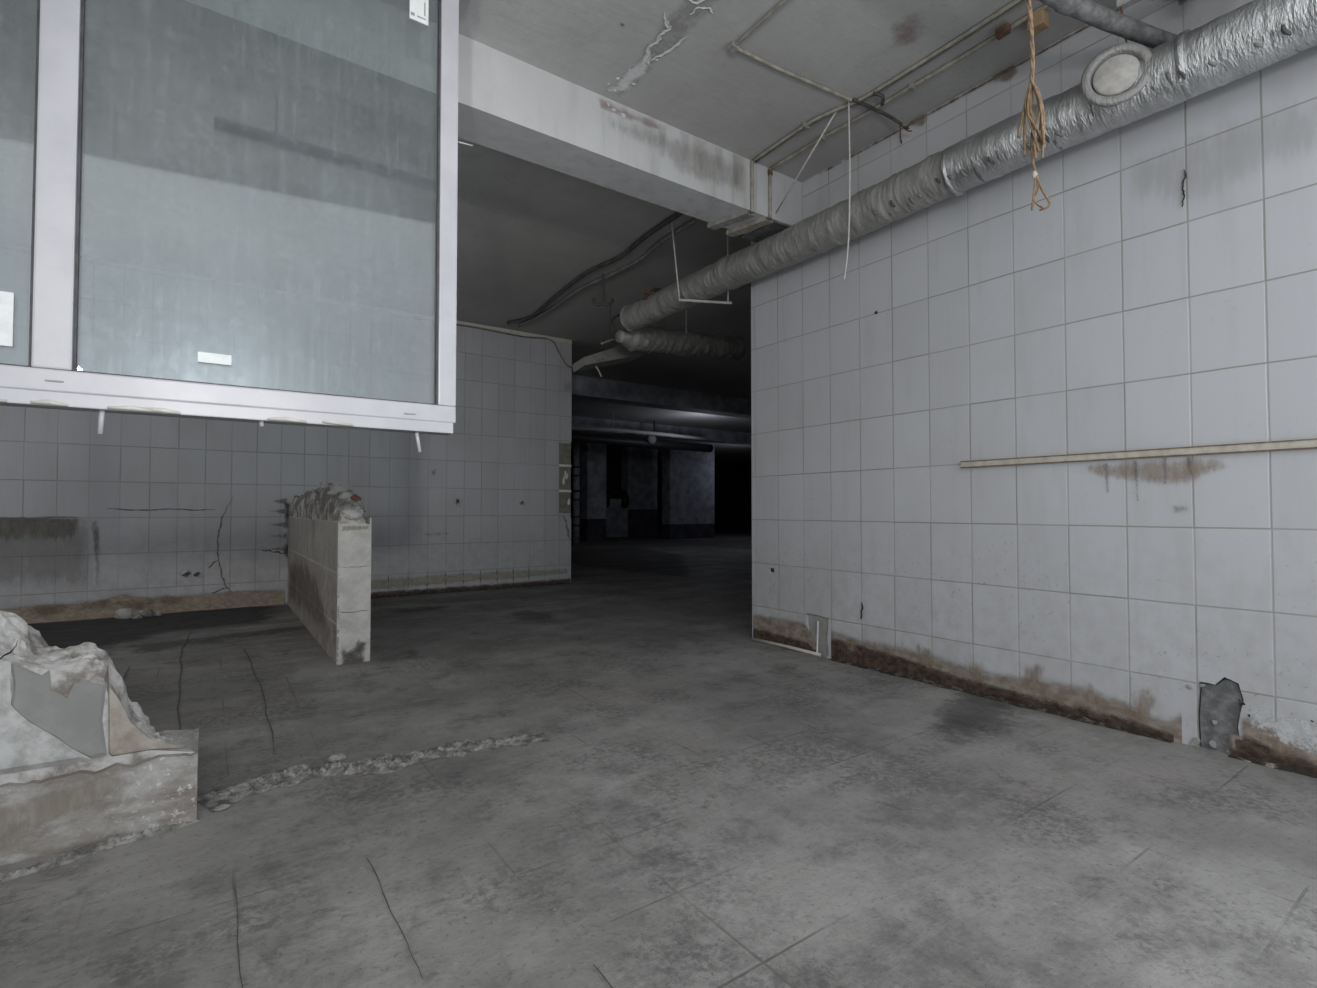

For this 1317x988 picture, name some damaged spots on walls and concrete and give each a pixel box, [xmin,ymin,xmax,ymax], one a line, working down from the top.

crack [607,0,713,92]
damp [0,516,77,539]
crack [107,497,233,593]
spalling [11,663,186,759]
crack [177,631,191,730]
crack [245,651,274,749]
spalling [1187,678,1317,753]